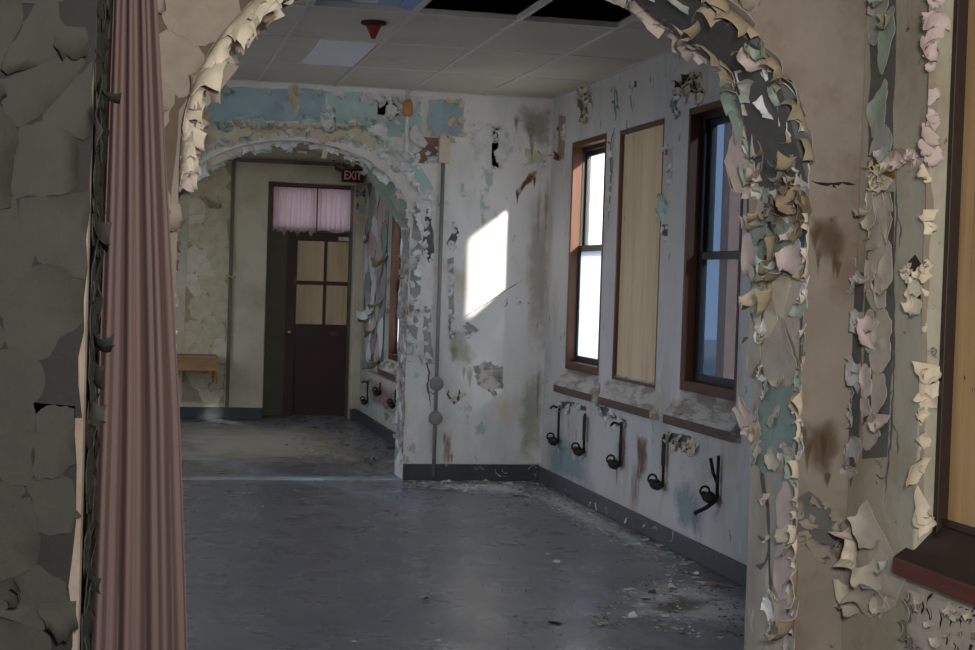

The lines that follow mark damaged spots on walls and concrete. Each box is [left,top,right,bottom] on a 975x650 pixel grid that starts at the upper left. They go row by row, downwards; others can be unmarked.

peeling [158,0,566,467]
peeling [572,85,593,124]
peeling [555,401,627,435]
peeling [606,0,975,650]